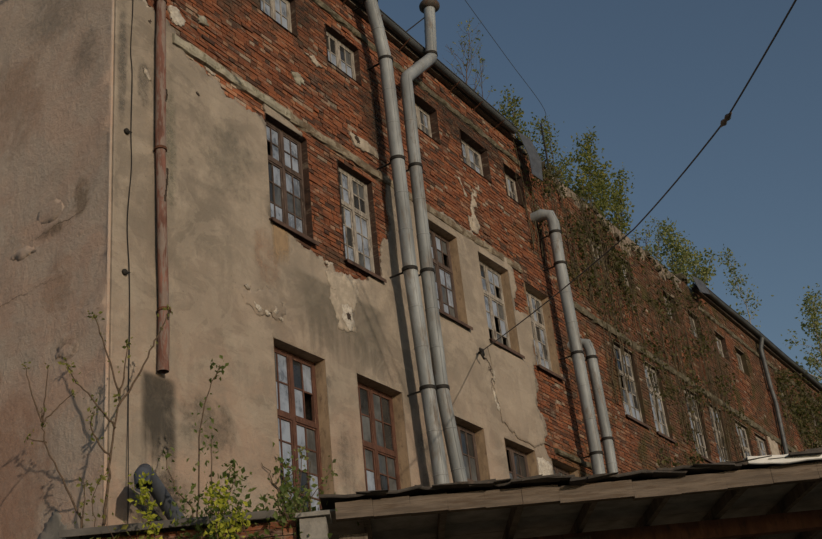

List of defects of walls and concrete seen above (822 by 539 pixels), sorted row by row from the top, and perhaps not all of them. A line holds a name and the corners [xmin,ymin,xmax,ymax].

spalling [275,130,389,333]
leakage [144,373,174,452]